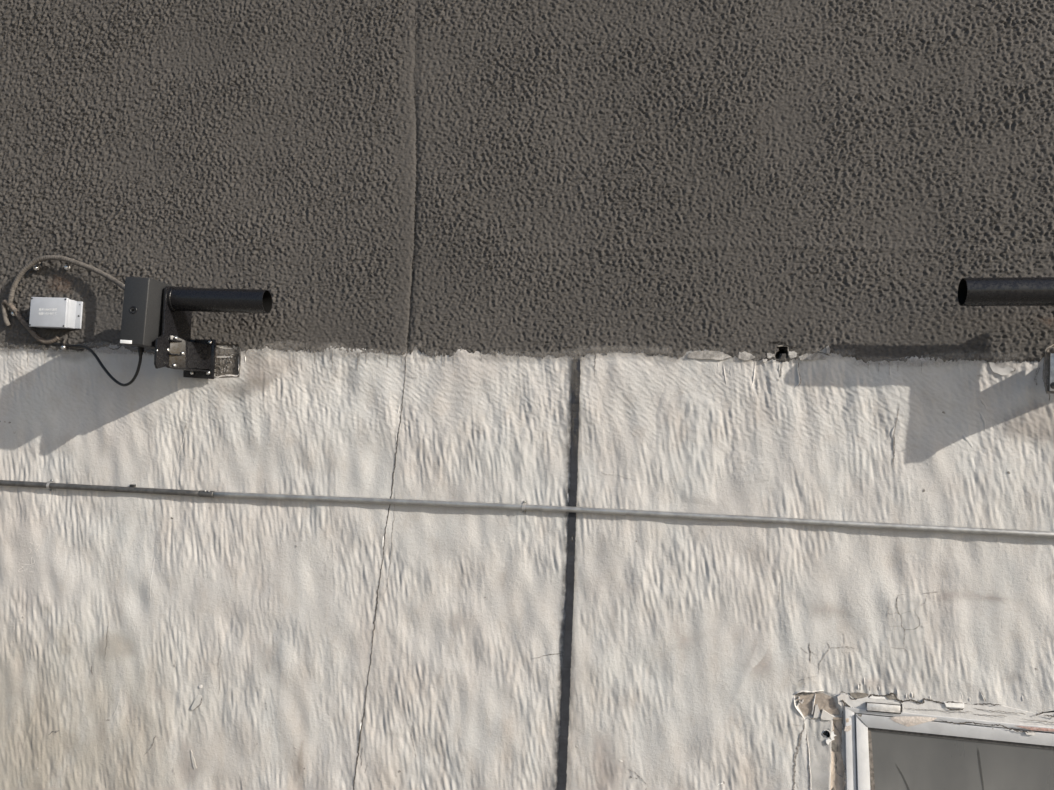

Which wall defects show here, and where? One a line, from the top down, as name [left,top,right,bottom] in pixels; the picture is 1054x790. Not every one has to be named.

crack [353,5,418,790]
spalling [793,690,851,790]